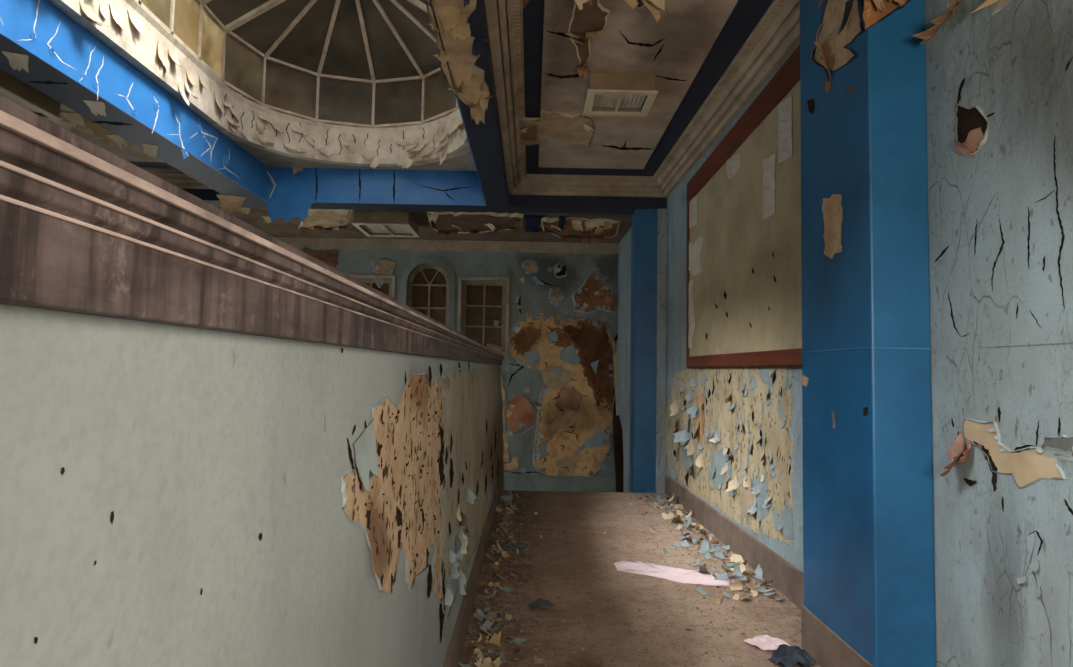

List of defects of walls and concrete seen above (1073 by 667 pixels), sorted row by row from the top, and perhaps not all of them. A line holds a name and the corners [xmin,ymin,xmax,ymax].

peeling [79,1,146,35]
peeling [565,0,610,79]
crack [0,0,241,179]
peeling [157,0,496,169]
peeling [953,78,995,158]
peeling [262,202,352,235]
spalling [822,194,843,259]
crack [934,135,1065,308]
crack [948,293,970,337]
peeling [340,258,618,642]
peeling [665,366,809,546]
peeling [939,417,1073,492]